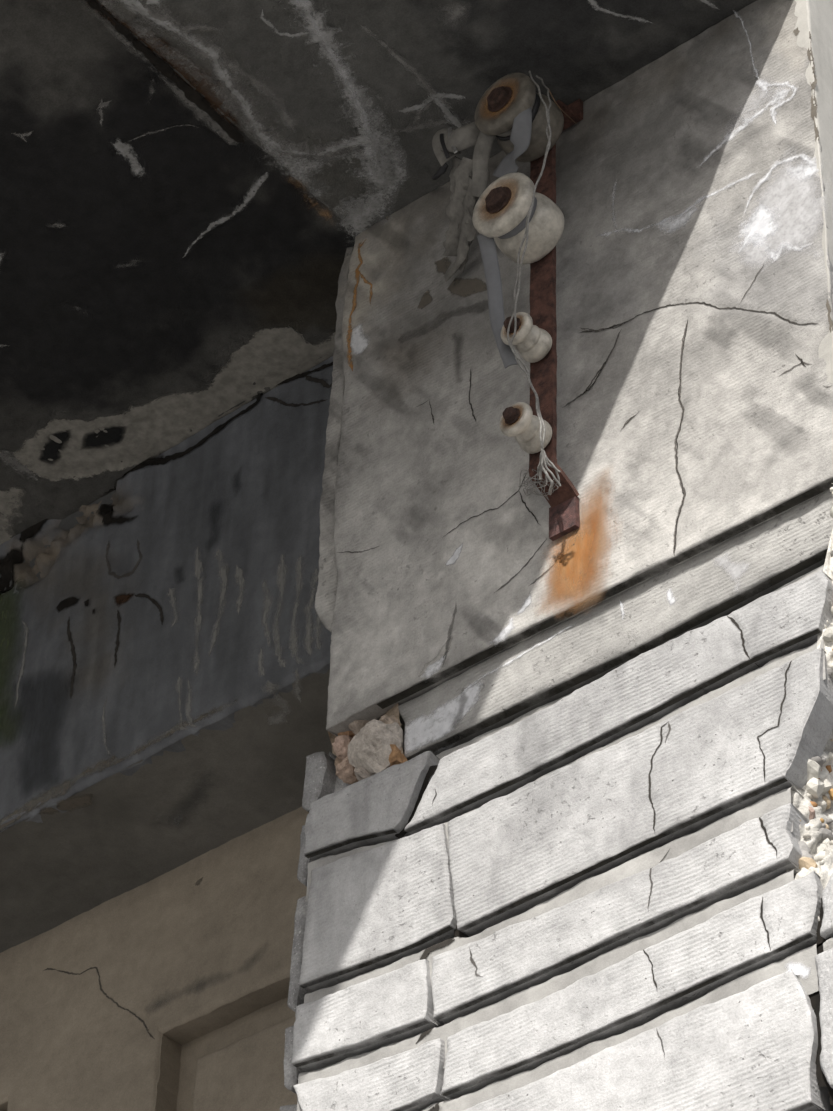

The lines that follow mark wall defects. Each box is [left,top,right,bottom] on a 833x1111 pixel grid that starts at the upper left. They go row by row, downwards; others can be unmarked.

crack [184,172,268,257]
rust [347,241,373,371]
peeling [13,327,336,526]
crack [562,264,818,556]
crack [442,473,574,593]
rust [556,515,600,595]
spalling [823,483,833,583]
spalling [817,606,833,681]
spalling [328,703,408,784]
crack [648,721,671,912]
spalling [786,729,833,889]
crack [43,967,154,1039]